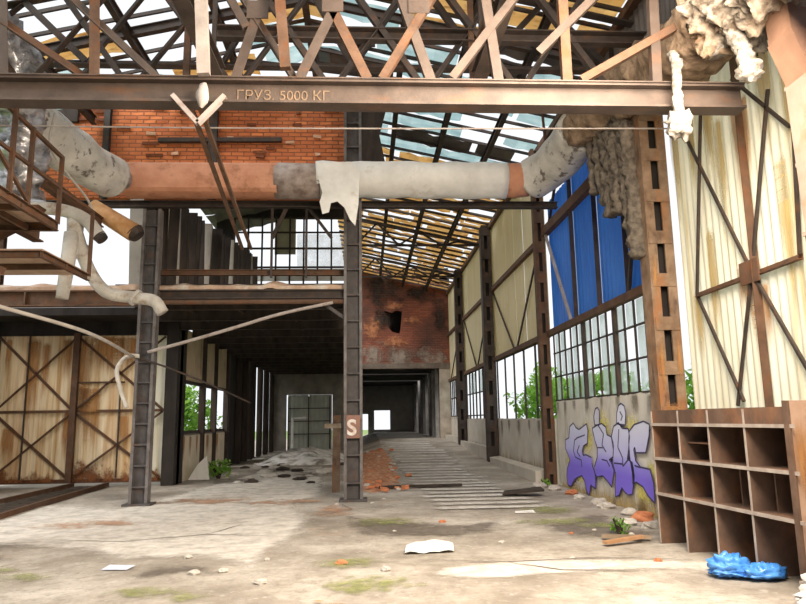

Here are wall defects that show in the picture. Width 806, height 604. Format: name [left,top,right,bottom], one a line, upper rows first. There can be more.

water stain [756,52,771,102]
water stain [781,79,791,131]
water stain [670,138,680,182]
water stain [703,115,726,202]
water stain [778,157,793,276]
water stain [707,232,718,315]
rust [28,341,50,391]
rust [64,337,136,432]
peeling [364,319,446,364]
water stain [695,295,703,343]
rust [1,429,13,453]
rust [0,461,129,483]